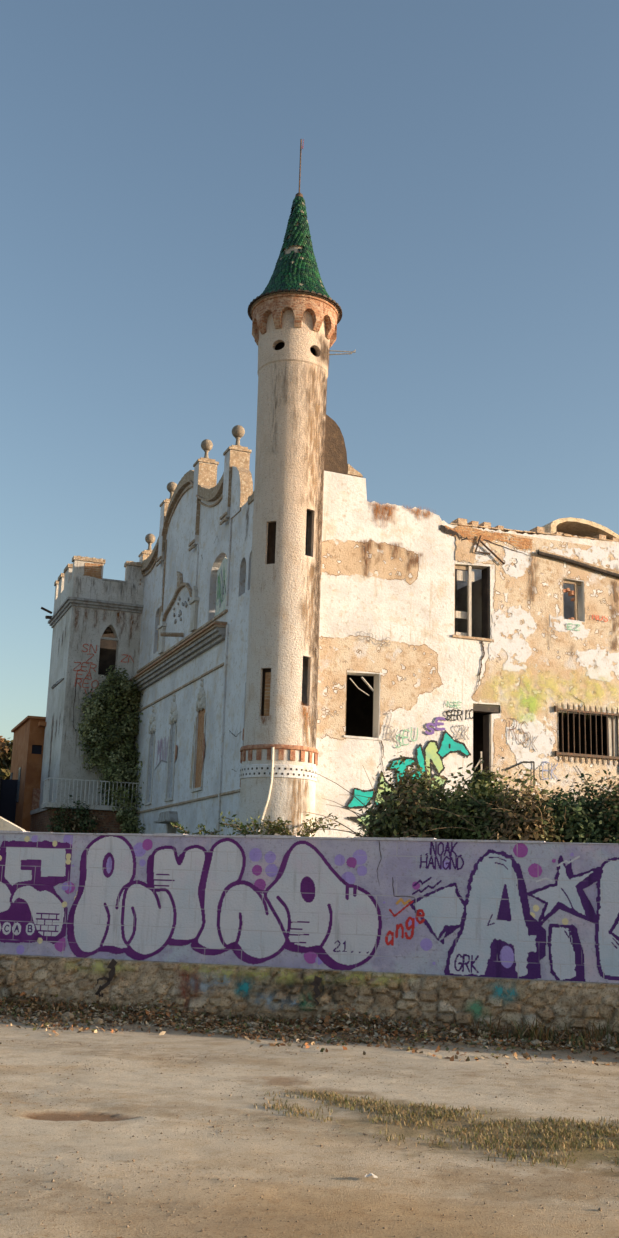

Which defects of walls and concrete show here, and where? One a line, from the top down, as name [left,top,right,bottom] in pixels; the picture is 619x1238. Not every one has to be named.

peeling [320,539,419,585]
peeling [316,635,443,740]
peeling [440,525,619,805]